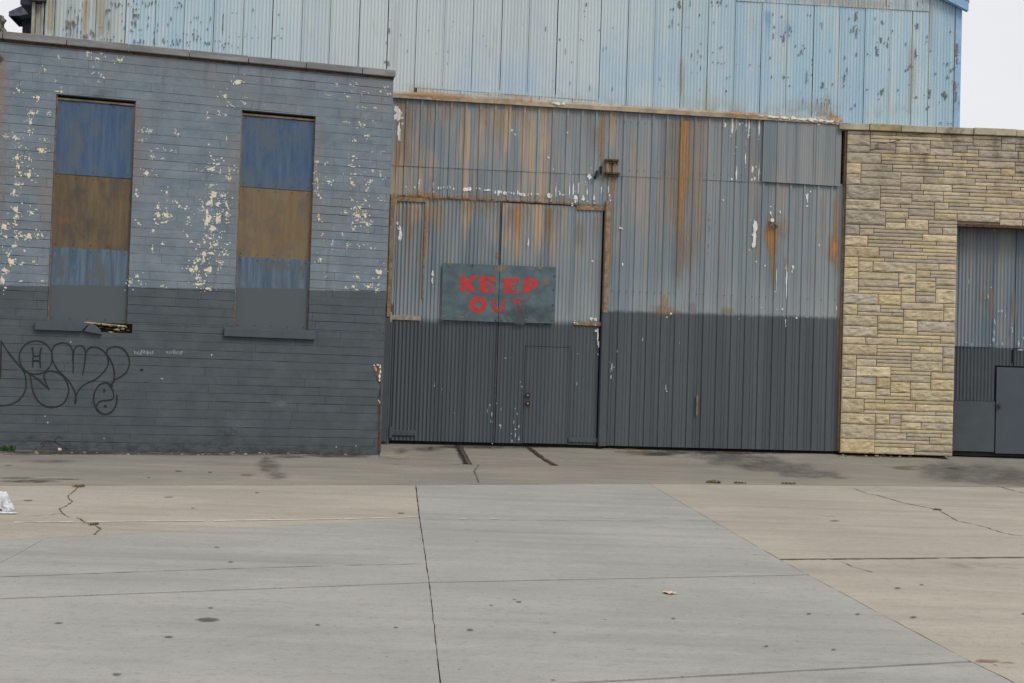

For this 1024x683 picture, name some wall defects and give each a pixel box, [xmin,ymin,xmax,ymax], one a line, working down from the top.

peeling [0,84,51,295]
peeling [135,144,238,291]
peeling [313,154,386,250]
peeling [405,173,611,206]
rust [677,120,703,248]
rust [766,221,788,269]
peeling [749,220,807,327]
spalling [84,322,132,334]
crack [18,487,101,534]